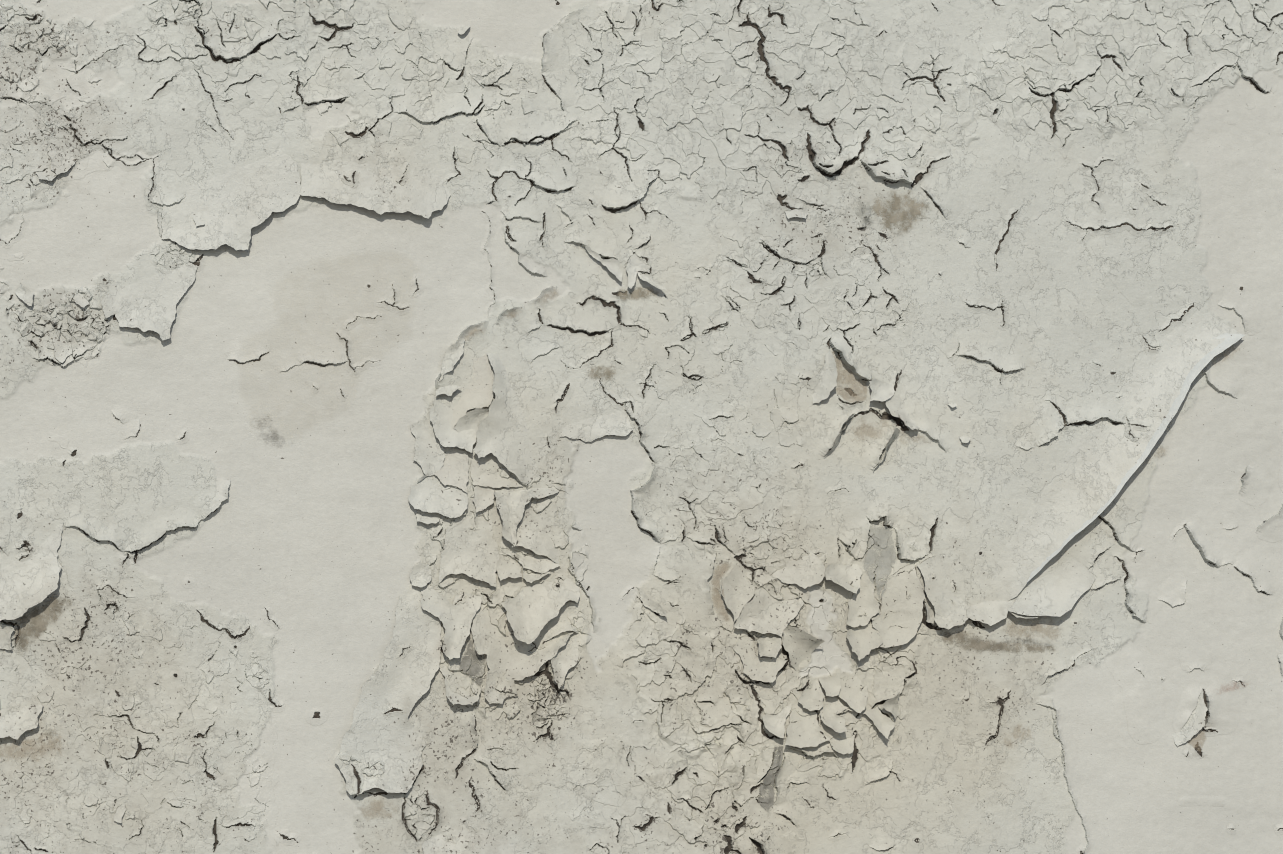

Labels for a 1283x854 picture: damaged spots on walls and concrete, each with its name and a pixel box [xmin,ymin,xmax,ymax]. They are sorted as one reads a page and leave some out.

crack [0,0,538,261]
peeling [0,0,673,368]
crack [423,0,1283,854]
peeling [0,705,43,739]
peeling [0,475,231,653]
spalling [169,669,182,682]
peeling [334,283,1278,854]